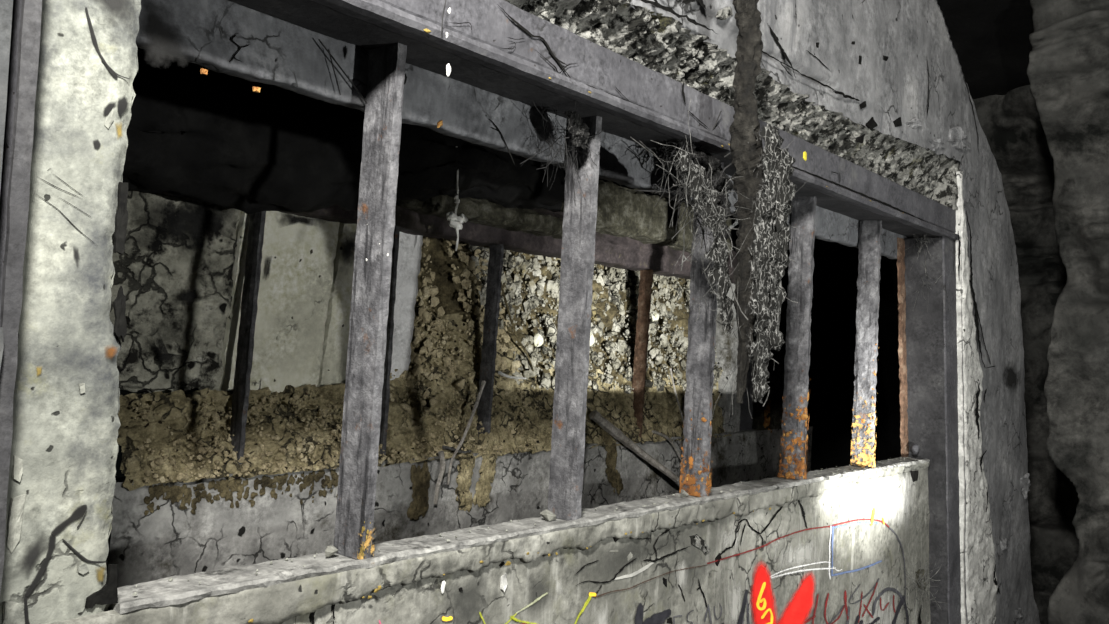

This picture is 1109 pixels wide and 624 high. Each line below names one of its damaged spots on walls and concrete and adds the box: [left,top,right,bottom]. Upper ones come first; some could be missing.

spalling [505,0,737,107]
corrosion [679,439,712,497]
corrosion [779,396,809,480]
corrosion [850,401,877,467]
corrosion [357,529,375,560]
crack [576,529,690,594]
crack [678,578,707,608]
crack [720,500,807,555]